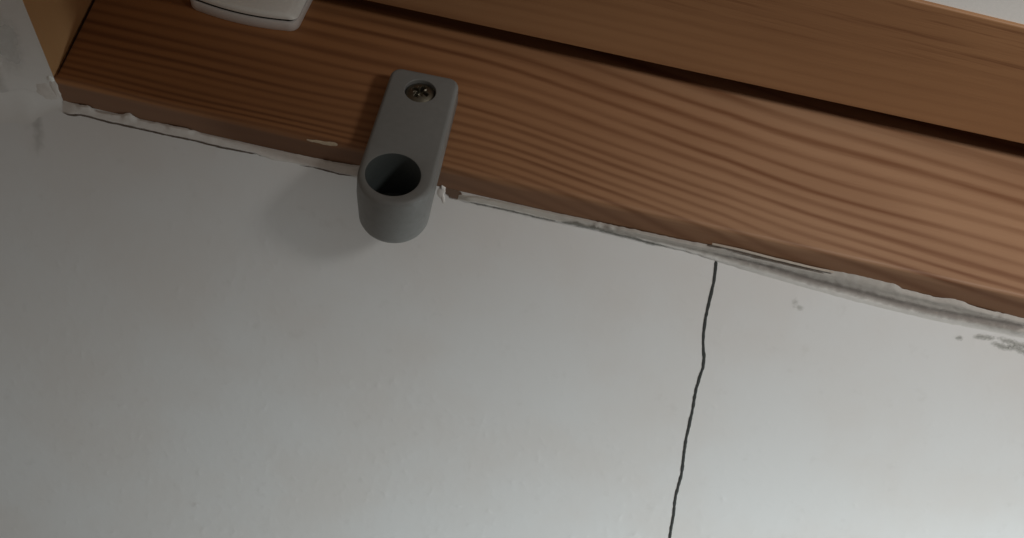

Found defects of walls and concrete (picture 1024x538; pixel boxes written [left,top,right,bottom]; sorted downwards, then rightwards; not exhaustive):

crack [668,261,718,538]